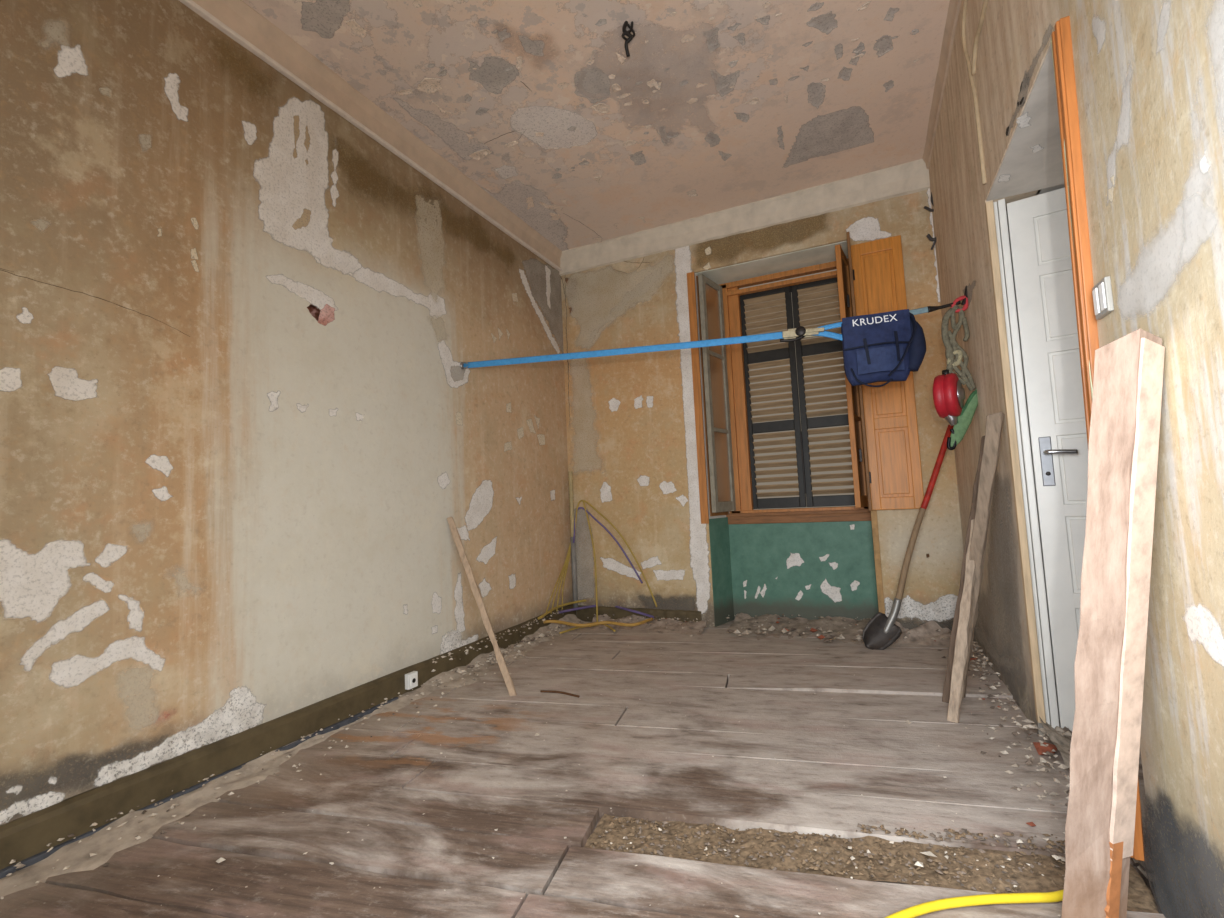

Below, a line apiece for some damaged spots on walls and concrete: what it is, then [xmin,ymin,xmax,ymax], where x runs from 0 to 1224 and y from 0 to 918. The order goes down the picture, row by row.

peeling [301,0,350,39]
peeling [756,2,919,167]
peeling [242,97,361,274]
crack [0,268,190,337]
peeling [743,553,804,599]
peeling [795,554,860,602]
damp [0,777,65,824]
damp [1142,793,1224,918]